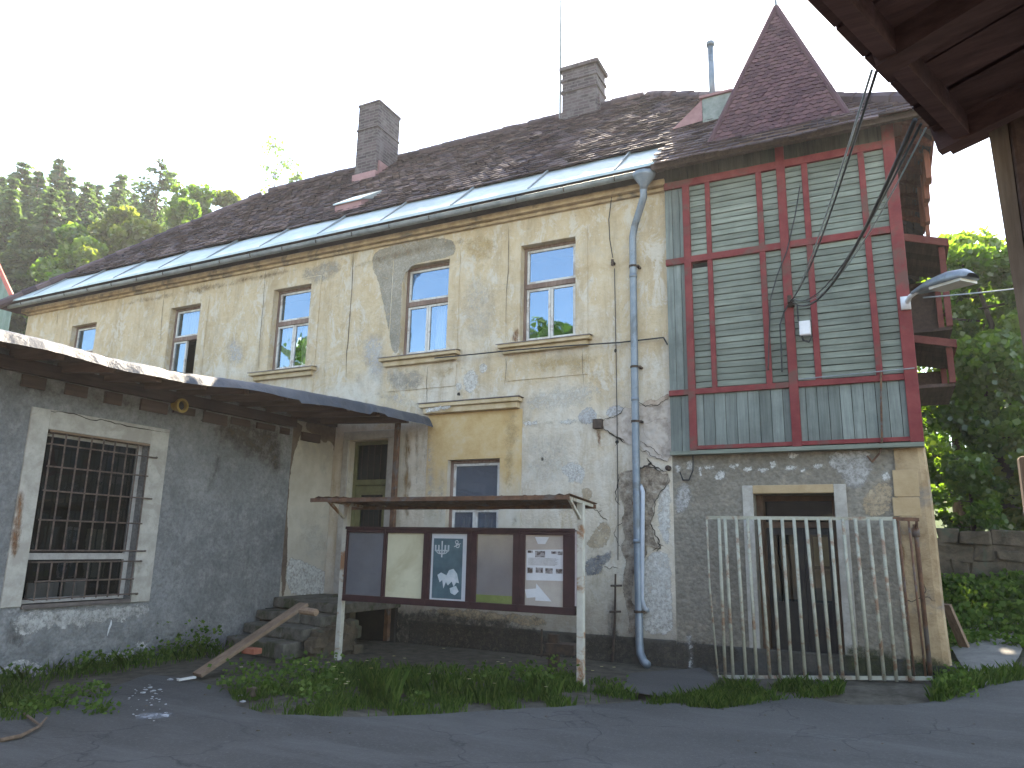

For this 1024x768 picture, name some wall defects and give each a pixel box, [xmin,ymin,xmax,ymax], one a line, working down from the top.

crack [346,253,354,360]
crack [613,434,666,472]
corrosion [12,495,23,554]
flaking render [561,394,822,635]